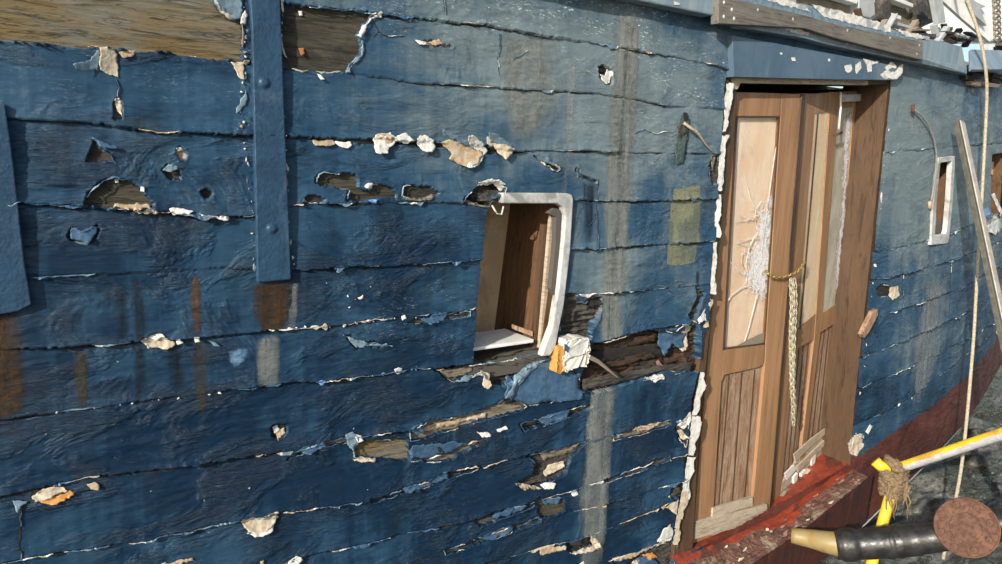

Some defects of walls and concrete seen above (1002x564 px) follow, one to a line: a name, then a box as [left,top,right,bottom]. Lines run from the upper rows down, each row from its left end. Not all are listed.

peeling [0,0,250,128]
peeling [281,0,383,80]
peeling [86,137,118,162]
peeling [162,146,186,179]
peeling [84,176,229,221]
peeling [67,225,100,245]
rust [255,282,290,332]
peeling [287,83,734,564]
rust [0,315,22,417]